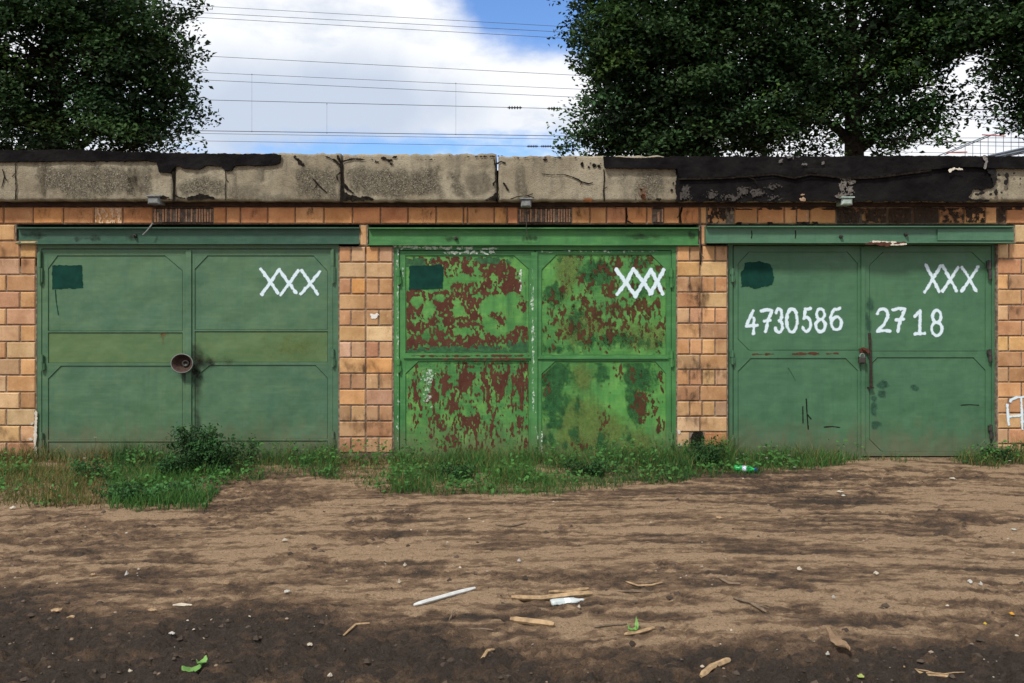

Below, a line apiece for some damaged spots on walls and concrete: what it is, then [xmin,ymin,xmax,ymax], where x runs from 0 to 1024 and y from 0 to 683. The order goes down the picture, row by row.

crack [313,155,365,203]
crack [492,159,633,225]
spalling [635,172,1023,226]
rust [542,255,666,355]
rust [406,257,529,453]
rust [613,363,665,449]